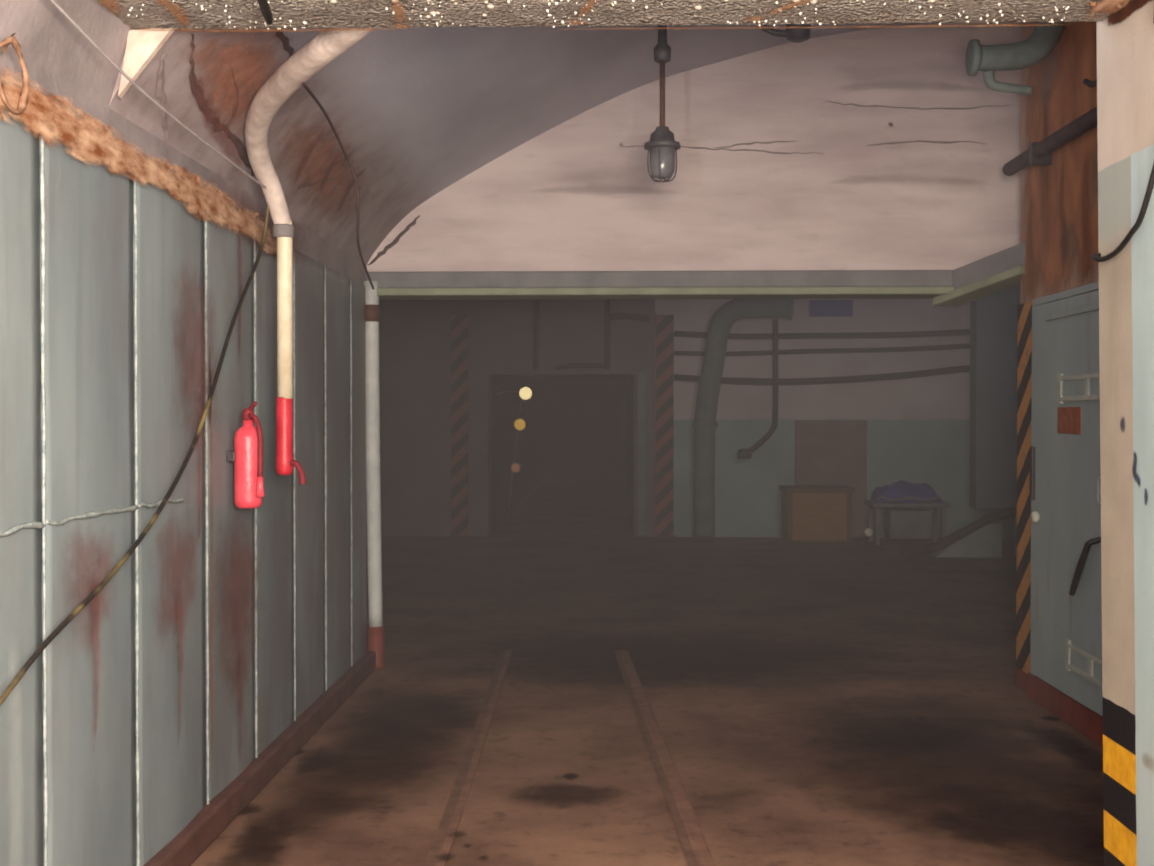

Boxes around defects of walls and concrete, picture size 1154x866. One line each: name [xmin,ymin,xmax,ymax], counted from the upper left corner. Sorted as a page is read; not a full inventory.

peeling [0,33,30,117]
corrosion [0,70,277,257]
corrosion [157,0,376,119]
crack [680,141,824,154]
corrosion [600,17,950,29]
crack [826,101,1012,110]
crack [867,139,986,147]
corrosion [1026,0,1151,143]
corrosion [1022,126,1099,300]